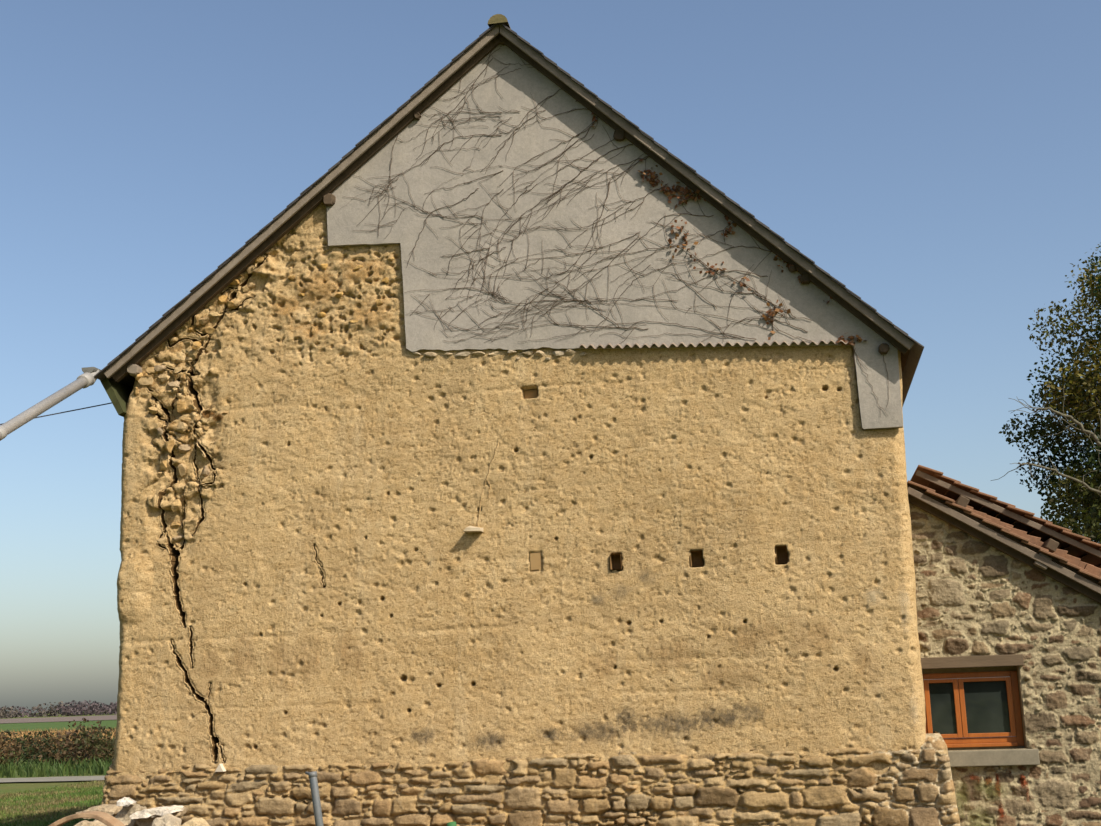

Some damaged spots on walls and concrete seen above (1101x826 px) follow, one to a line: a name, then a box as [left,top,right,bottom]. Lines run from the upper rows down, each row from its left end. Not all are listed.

crack [147,256,267,762]
crack [312,546,326,587]
leakage [649,707,758,730]